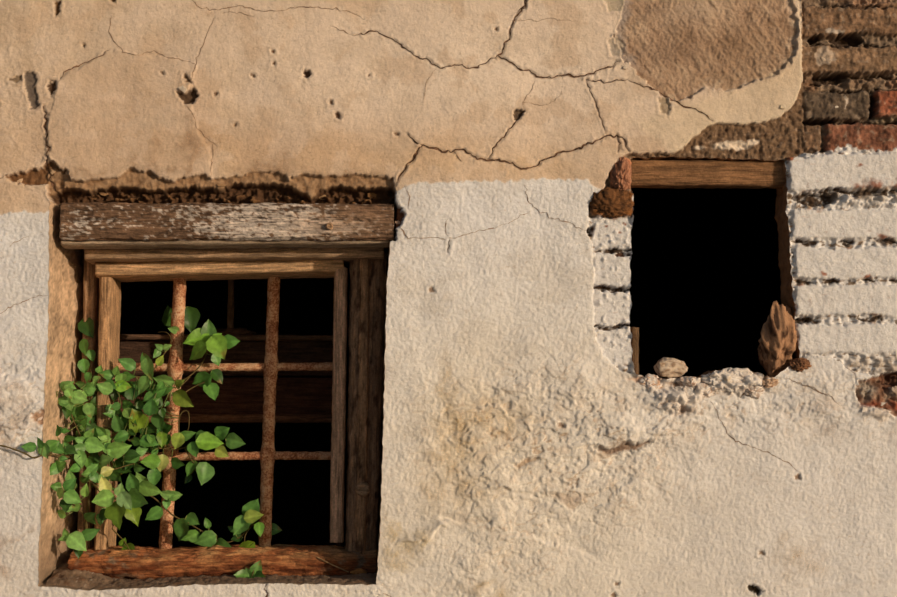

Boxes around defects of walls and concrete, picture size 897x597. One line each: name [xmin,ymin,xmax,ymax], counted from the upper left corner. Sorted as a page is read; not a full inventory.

spalling [611,0,897,163]
crack [43,106,61,202]
spalling [4,158,399,208]
crack [60,0,711,249]
spalling [609,156,632,191]
spalling [854,371,897,418]
crack [711,402,799,472]